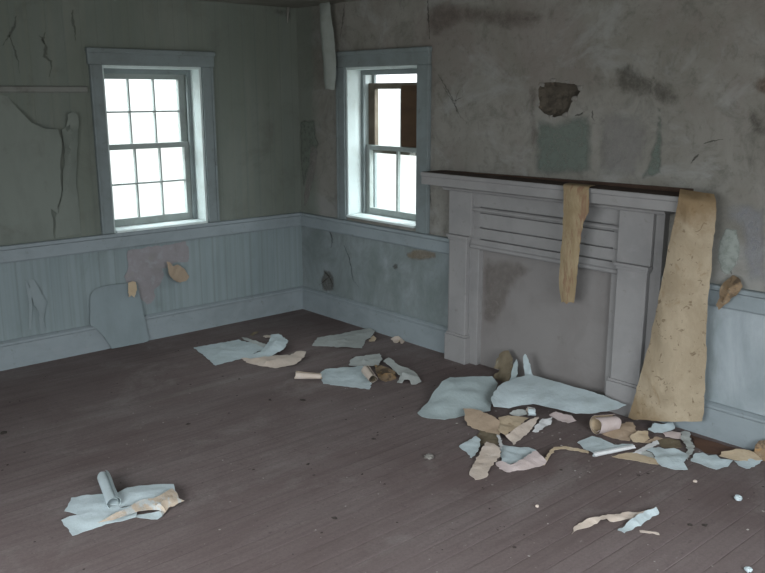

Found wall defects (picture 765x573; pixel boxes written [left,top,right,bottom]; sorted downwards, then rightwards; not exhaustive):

flaking render [535,78,583,119]
flaking render [124,241,189,304]